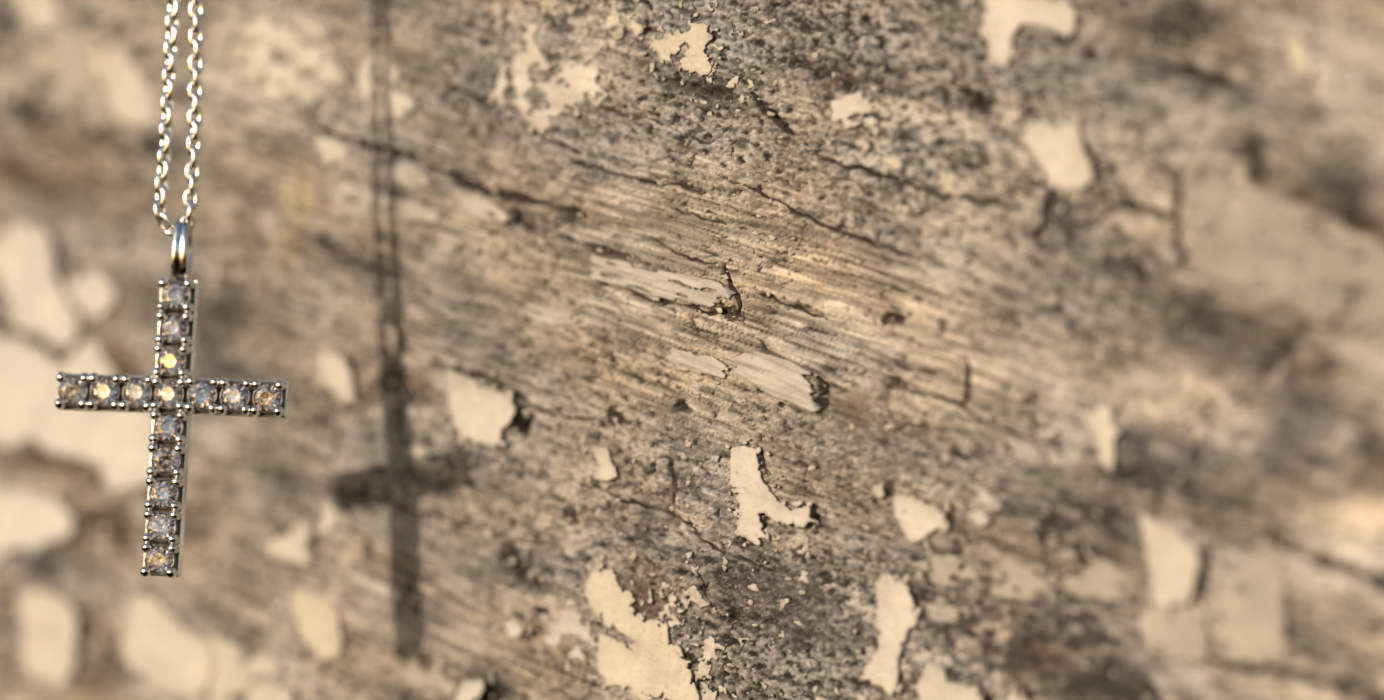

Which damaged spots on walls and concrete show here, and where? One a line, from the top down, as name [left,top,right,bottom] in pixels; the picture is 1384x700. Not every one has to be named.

crack [443,74,498,104]
crack [316,129,827,322]
peeling [489,0,762,152]
crack [522,91,1007,260]
peeling [967,0,1078,77]
peeling [1013,102,1108,211]
crack [1034,144,1187,269]
peeling [387,352,537,479]
peeling [491,541,749,700]
crack [568,456,782,598]
peeling [714,439,823,572]
peeling [843,449,1295,700]